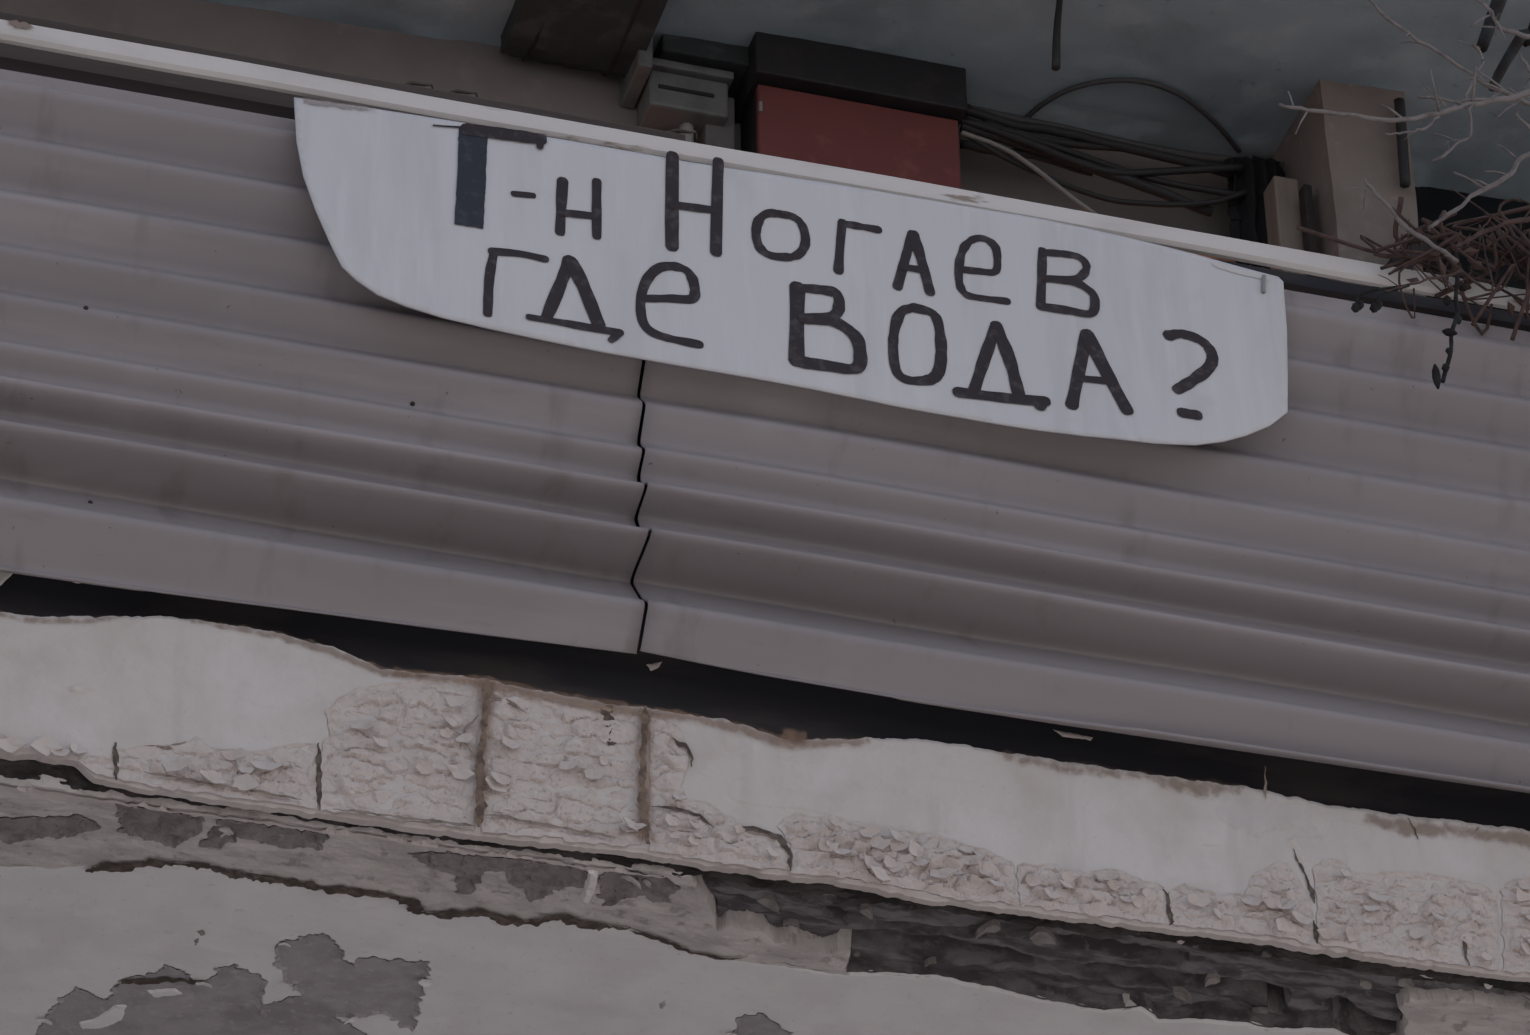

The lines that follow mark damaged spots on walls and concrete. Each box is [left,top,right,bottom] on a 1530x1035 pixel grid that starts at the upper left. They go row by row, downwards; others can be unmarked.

spalling [0,679,1530,1035]
crack [1293,848,1319,943]